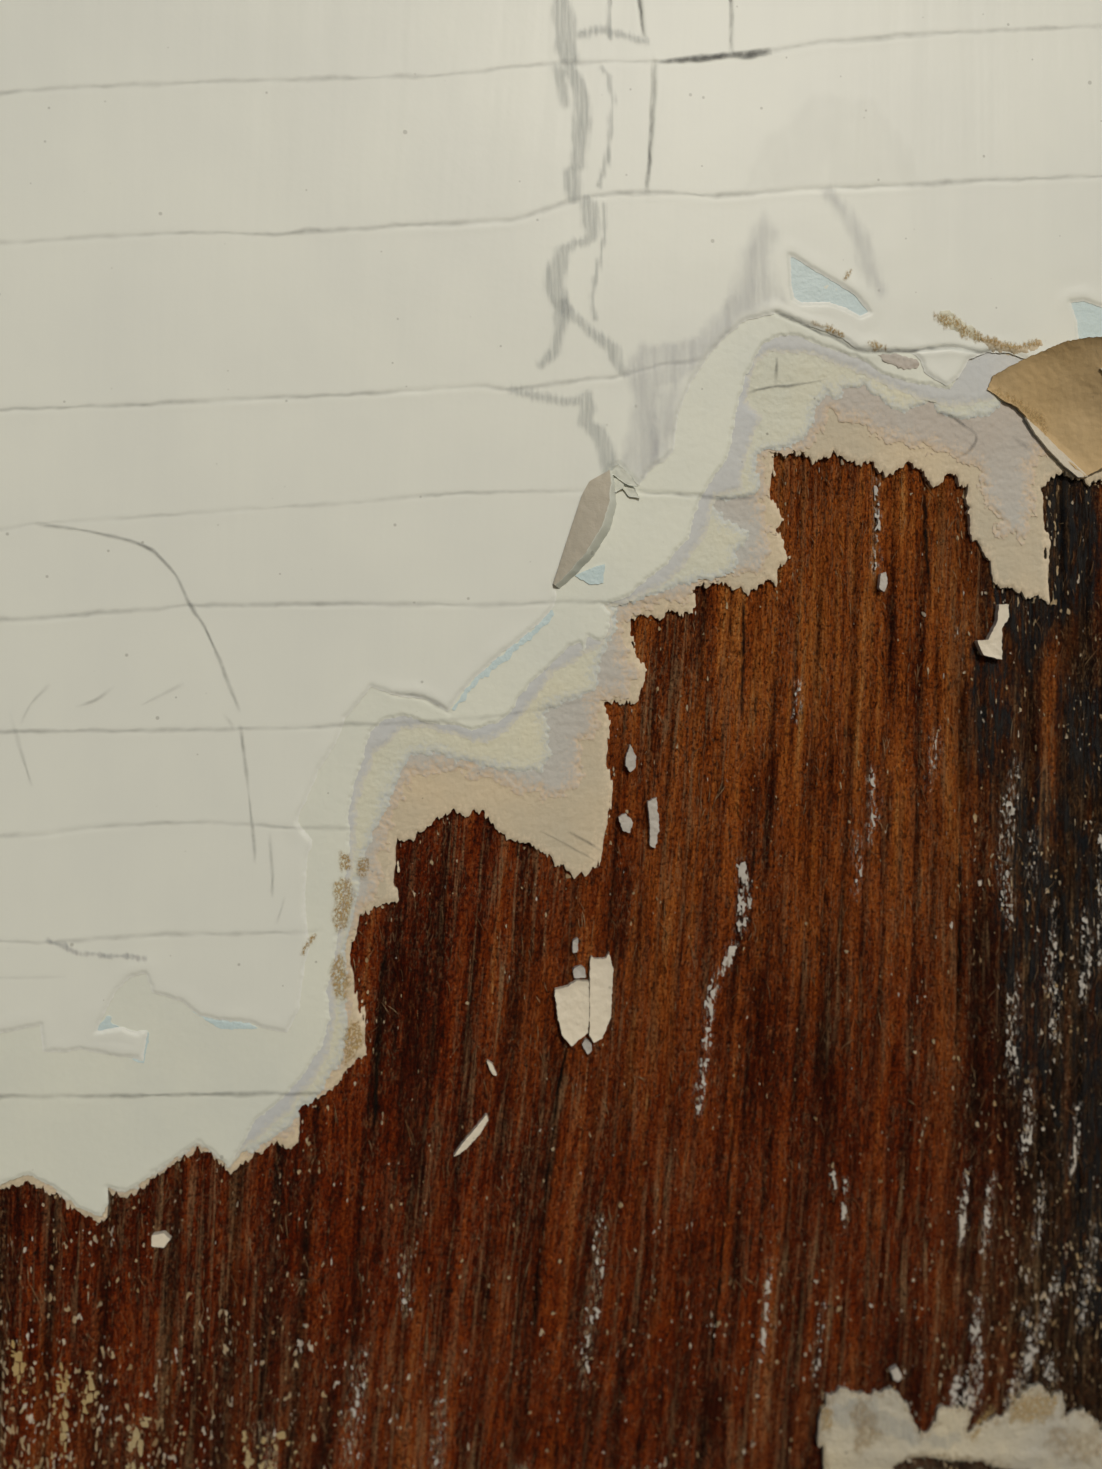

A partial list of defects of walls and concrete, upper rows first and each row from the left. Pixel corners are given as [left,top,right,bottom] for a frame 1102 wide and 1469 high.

crack [669,51,761,61]
peeling [1071,301,1102,339]
peeling [0,310,1102,1228]
peeling [151,1230,172,1248]
peeling [958,1175,995,1253]
peeling [339,1351,368,1460]
peeling [580,1307,600,1373]
peeling [759,1267,773,1363]
peeling [888,1364,902,1382]
peeling [949,1296,983,1407]
peeling [1003,1271,1060,1405]
peeling [242,1428,298,1469]